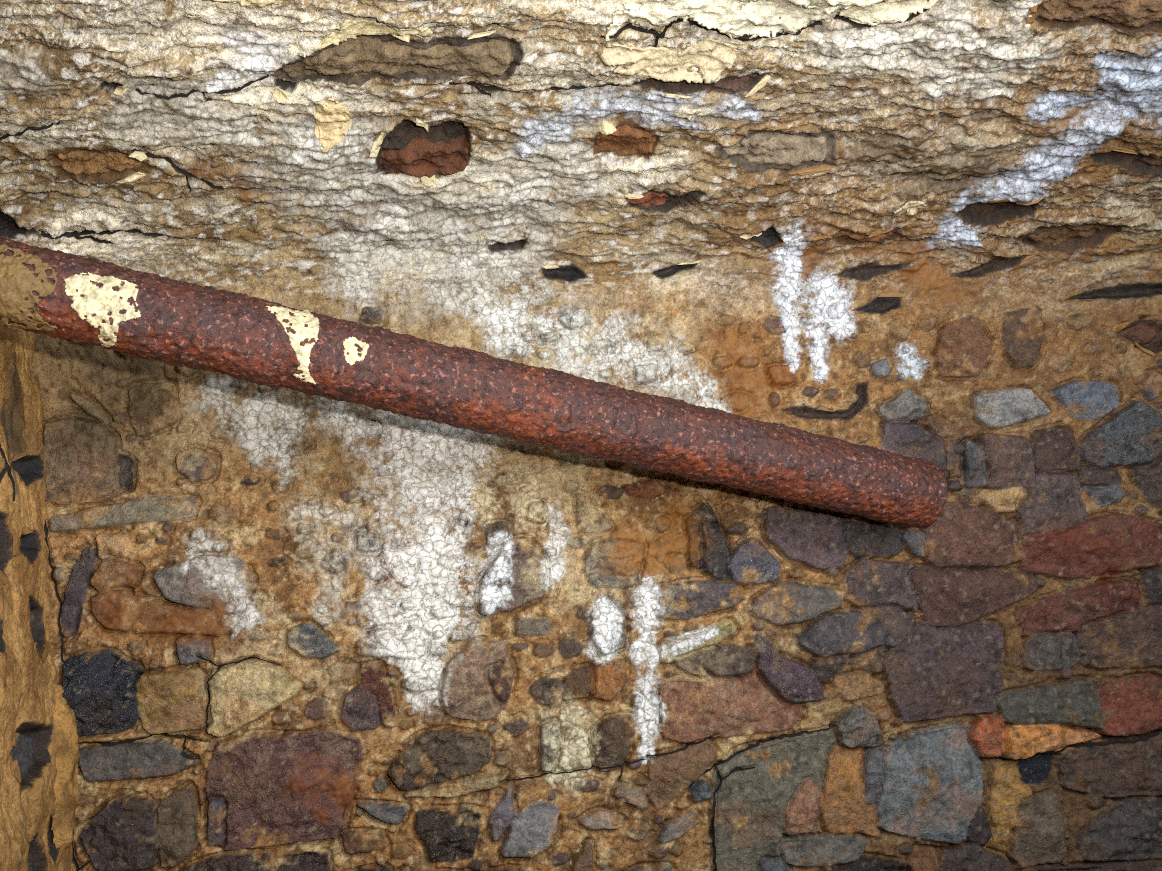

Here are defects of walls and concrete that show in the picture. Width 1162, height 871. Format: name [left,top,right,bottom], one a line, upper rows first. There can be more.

crack [136,75,270,101]
peeling [314,98,352,153]
spalling [268,18,526,103]
spalling [369,116,474,186]
crack [601,2,938,47]
damp [908,36,1162,247]
crack [33,229,165,244]
corrosion [801,216,839,281]
damp [770,221,856,383]
corrosion [721,331,798,415]
damp [181,377,569,713]
damp [586,575,719,764]